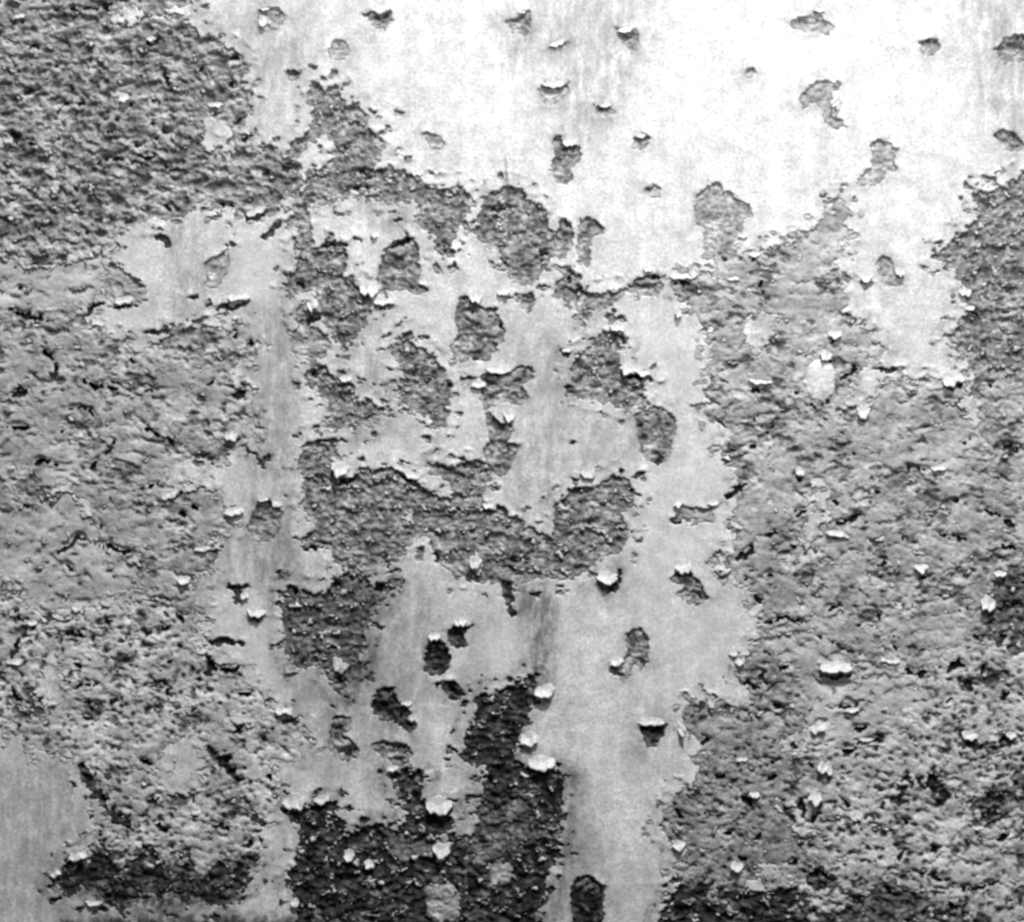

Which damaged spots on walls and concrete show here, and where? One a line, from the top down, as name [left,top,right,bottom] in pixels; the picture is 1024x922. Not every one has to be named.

peeling [257,7,286,33]
peeling [0,239,287,632]
peeling [273,39,1024,750]